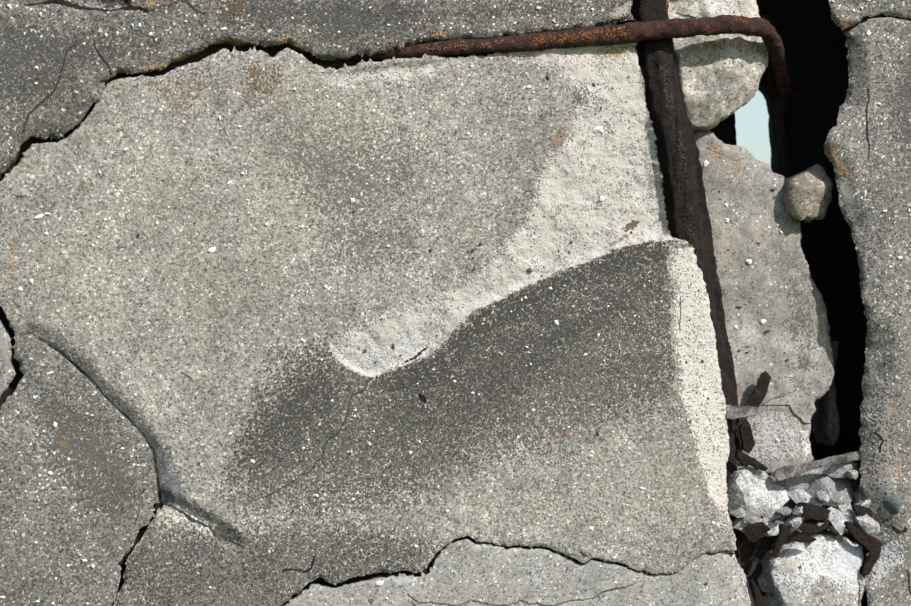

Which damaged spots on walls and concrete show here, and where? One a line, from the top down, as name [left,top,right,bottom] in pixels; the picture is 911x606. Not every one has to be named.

crack [0,0,383,181]
crack [436,35,508,58]
rust [584,44,634,57]
spalling [837,177,860,239]
spalling [319,43,739,525]
crack [0,306,24,405]
crack [70,361,245,606]
water stain [115,240,700,606]
rust [725,371,771,471]
spalling [745,401,811,466]
spalling [770,348,905,606]
crack [280,536,663,606]